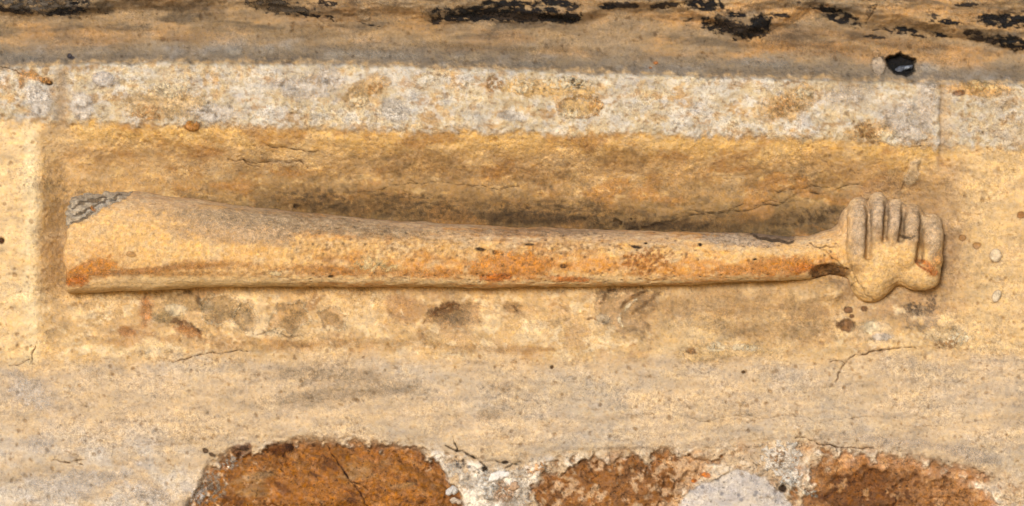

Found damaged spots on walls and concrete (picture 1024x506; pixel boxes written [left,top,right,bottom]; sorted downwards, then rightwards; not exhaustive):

crack [830,347,911,380]
spalling [269,443,294,456]
spalling [190,443,251,504]